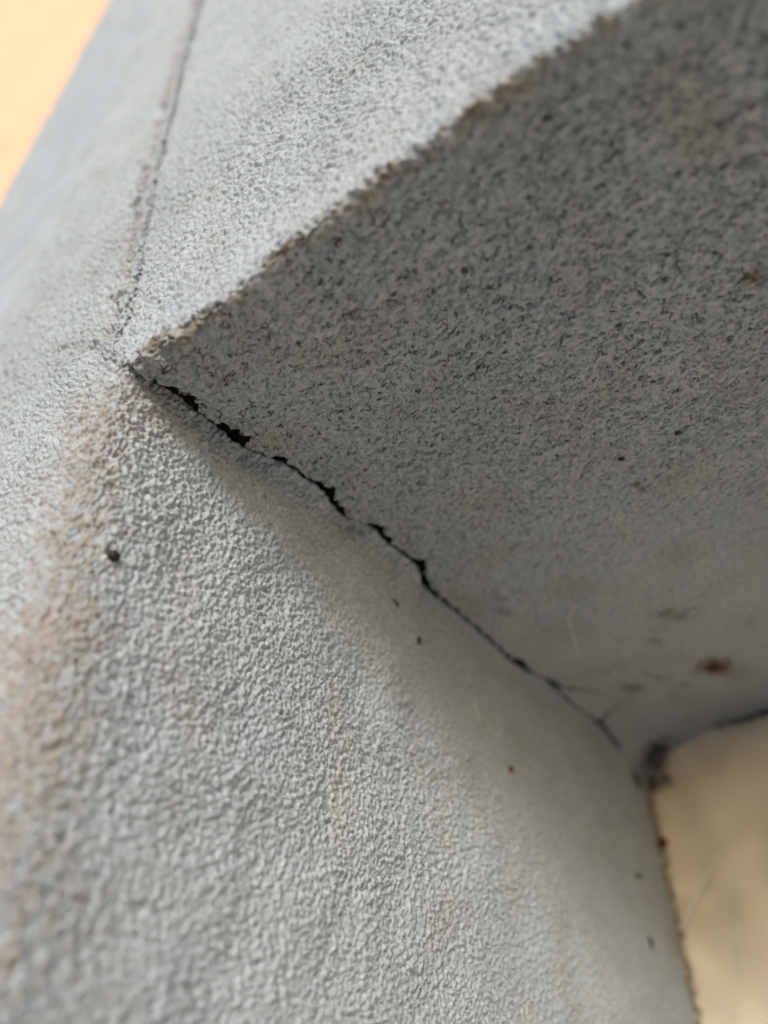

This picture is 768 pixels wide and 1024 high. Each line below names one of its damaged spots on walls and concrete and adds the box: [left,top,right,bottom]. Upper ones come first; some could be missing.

crack [124,365,643,777]